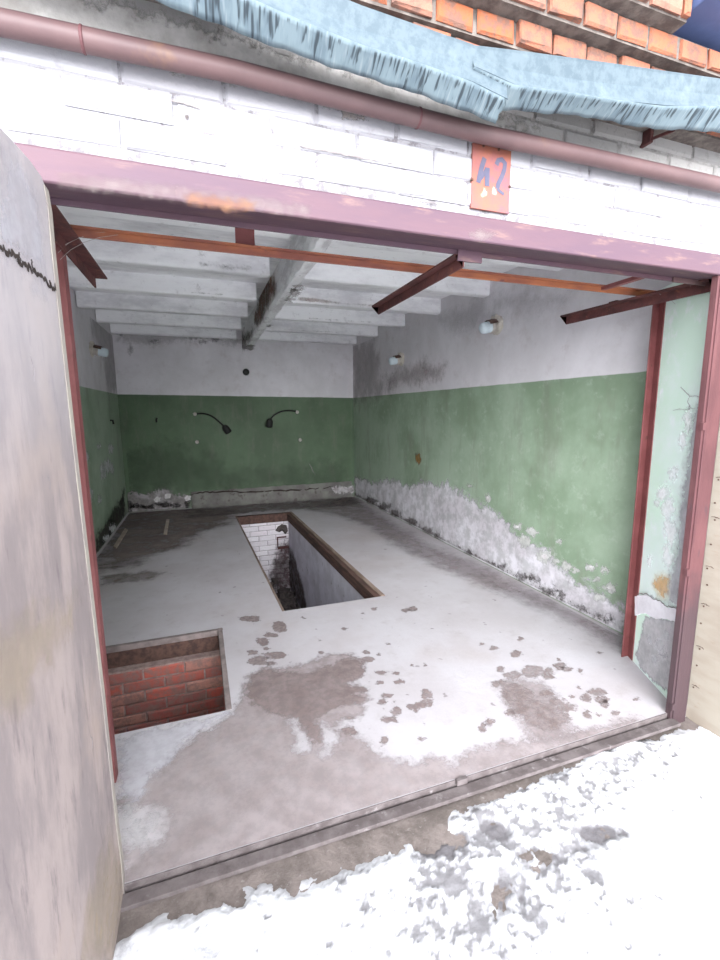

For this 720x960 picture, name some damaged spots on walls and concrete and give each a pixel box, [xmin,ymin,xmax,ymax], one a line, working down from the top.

peeling [127,489,191,512]
leakage [96,487,615,636]
peeling [332,410,697,690]
corrosion [654,577,668,597]
leakage [116,621,636,883]